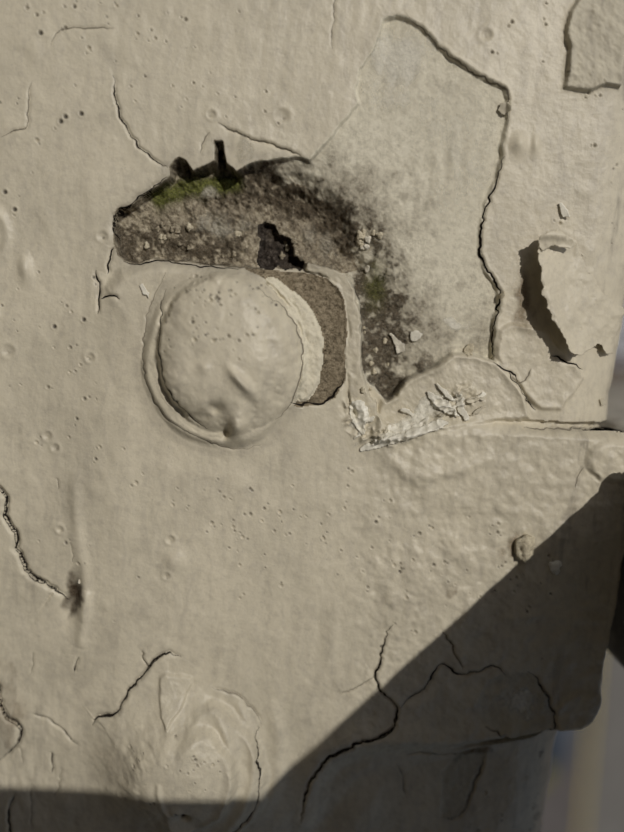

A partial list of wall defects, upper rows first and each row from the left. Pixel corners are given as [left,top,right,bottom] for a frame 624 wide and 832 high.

crack [409,17,509,114]
peeling [563,0,624,93]
leakage [116,210,252,266]
leakage [155,143,416,399]
peeling [113,14,624,433]
crack [0,487,68,599]
crack [0,685,53,761]
crack [92,651,181,726]
crack [301,627,502,823]
crack [527,671,556,730]
crack [8,785,33,832]
crack [51,752,62,794]